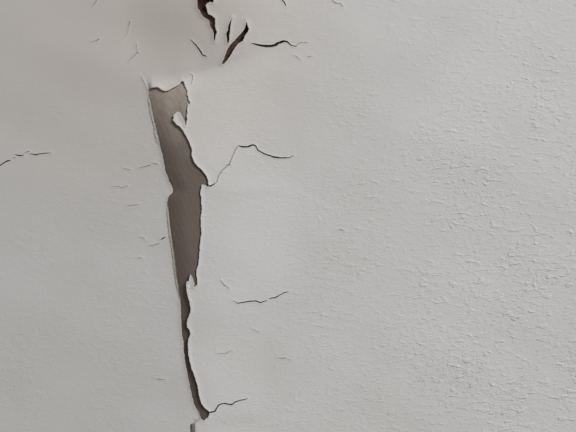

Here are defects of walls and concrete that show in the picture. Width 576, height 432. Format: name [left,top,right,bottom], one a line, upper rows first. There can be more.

crack [197,0,311,64]
crack [209,144,294,187]
peeling [147,76,209,420]
crack [221,281,286,304]